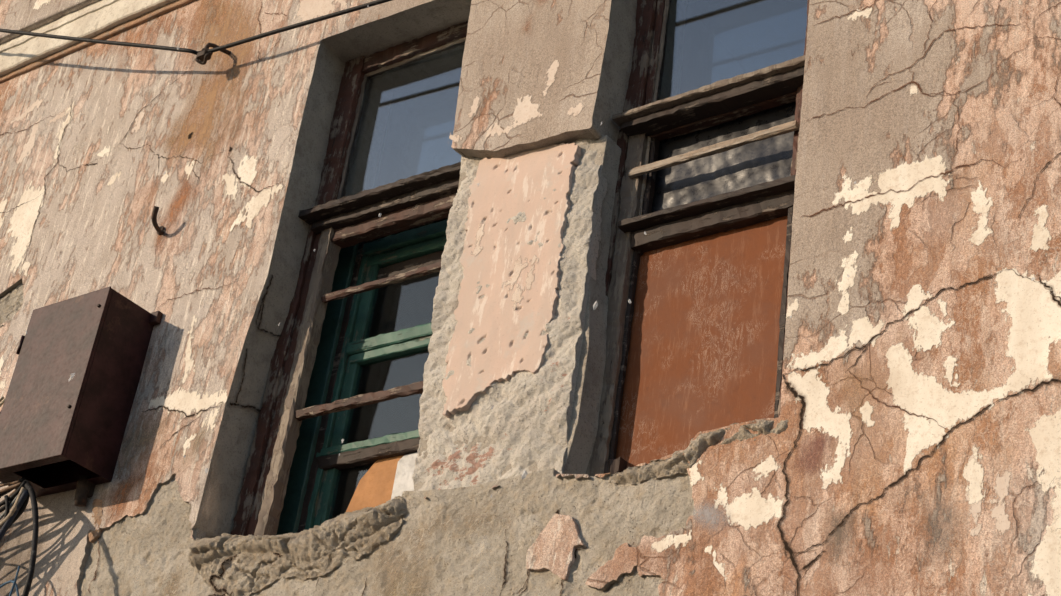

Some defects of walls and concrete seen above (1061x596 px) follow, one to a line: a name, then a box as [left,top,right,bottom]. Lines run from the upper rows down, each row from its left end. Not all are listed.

peeling [295,0,348,22]
crack [0,97,97,275]
crack [117,61,283,192]
peeling [832,154,951,231]
crack [800,0,1061,218]
spalling [80,134,788,596]
crack [500,529,530,596]
peeling [786,227,884,489]
crack [777,269,1061,596]
peeling [886,268,1061,474]
peeling [962,446,1012,536]
peeling [1025,408,1061,596]